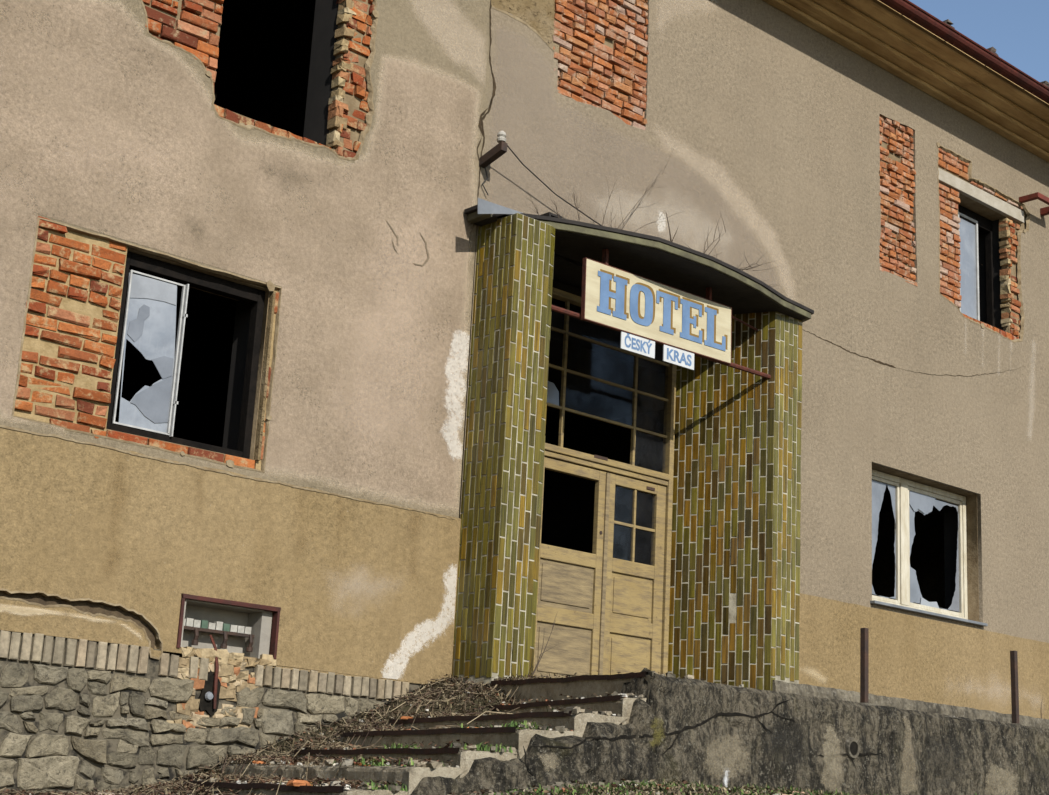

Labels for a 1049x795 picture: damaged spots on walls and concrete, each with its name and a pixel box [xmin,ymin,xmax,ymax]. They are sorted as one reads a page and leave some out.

spalling [141,0,379,160]
crack [477,0,496,196]
spalling [491,0,561,53]
leakage [0,0,794,510]
spalling [937,142,1031,343]
spalling [12,217,282,472]
crack [804,330,1008,377]
peeling [0,604,61,616]
leakage [383,565,457,679]
spalling [166,647,277,731]
crack [523,699,795,775]